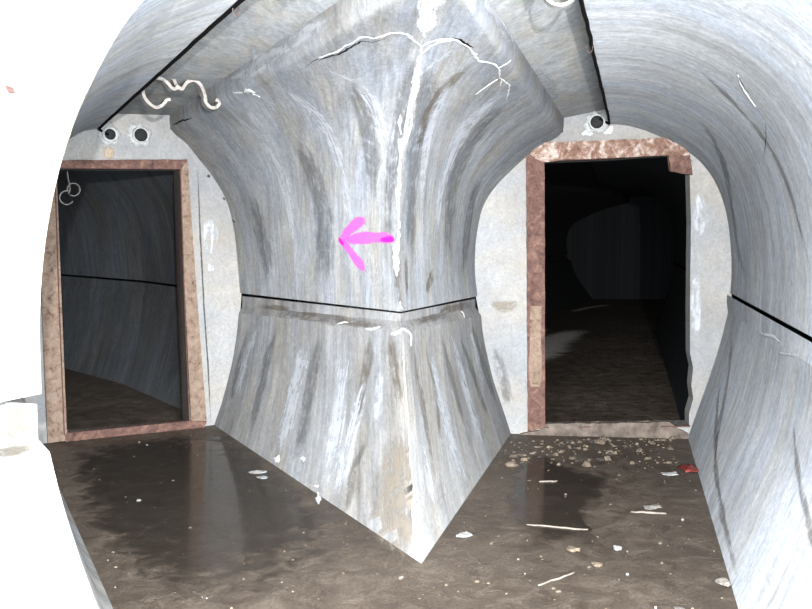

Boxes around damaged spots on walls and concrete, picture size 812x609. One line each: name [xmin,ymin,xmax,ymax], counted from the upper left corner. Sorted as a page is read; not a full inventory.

leakage [238,118,294,238]
leakage [226,20,325,97]
leakage [289,92,353,220]
leakage [340,75,388,163]
crack [309,32,511,100]
leakage [392,0,450,276]